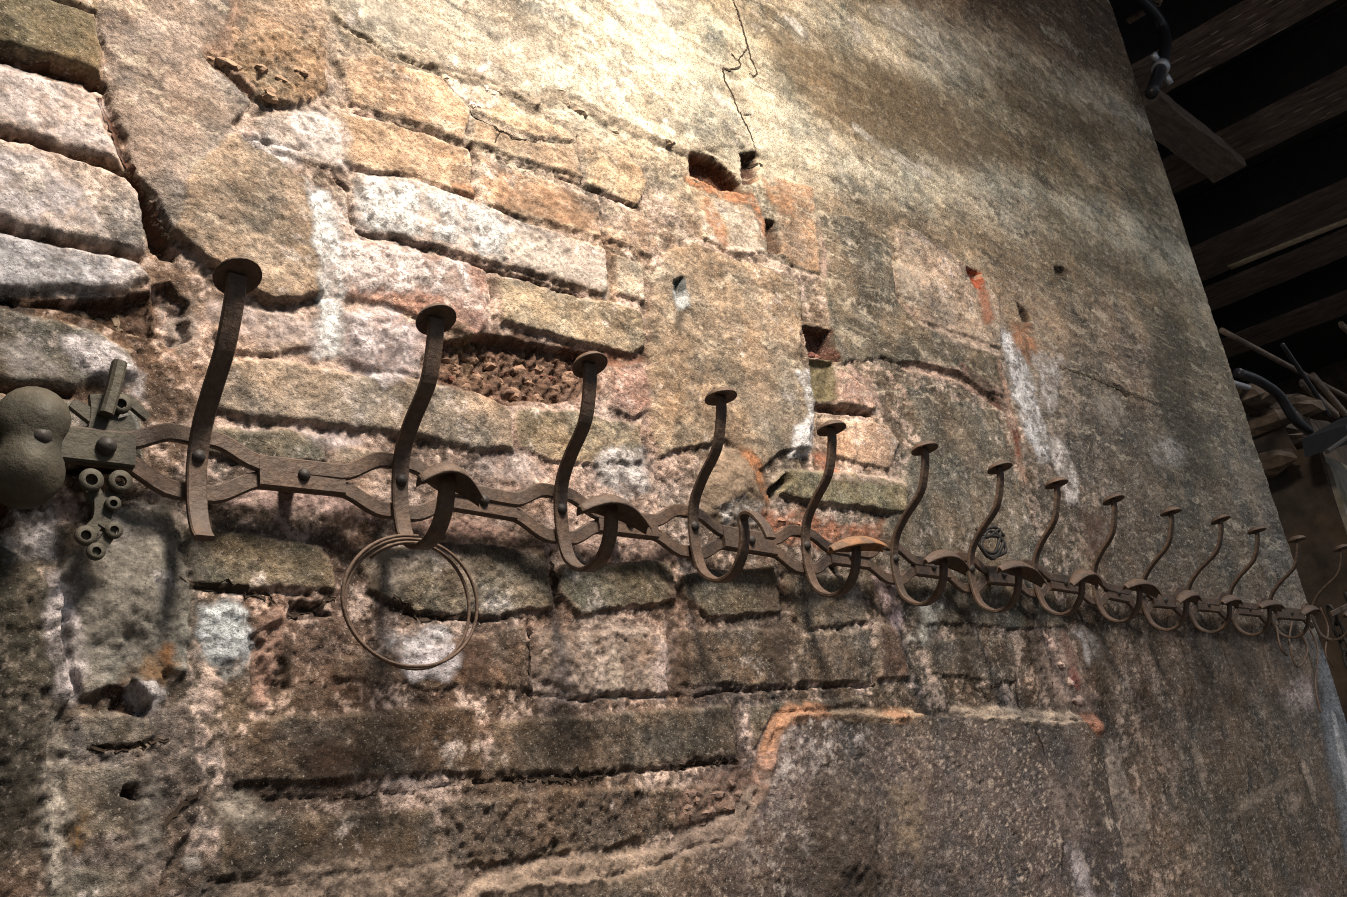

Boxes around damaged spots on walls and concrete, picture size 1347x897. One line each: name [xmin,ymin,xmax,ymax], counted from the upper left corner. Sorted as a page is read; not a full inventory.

crack [722,0,763,169]
spalling [437,333,597,406]
water stain [833,472,903,485]
water stain [901,290,1079,502]